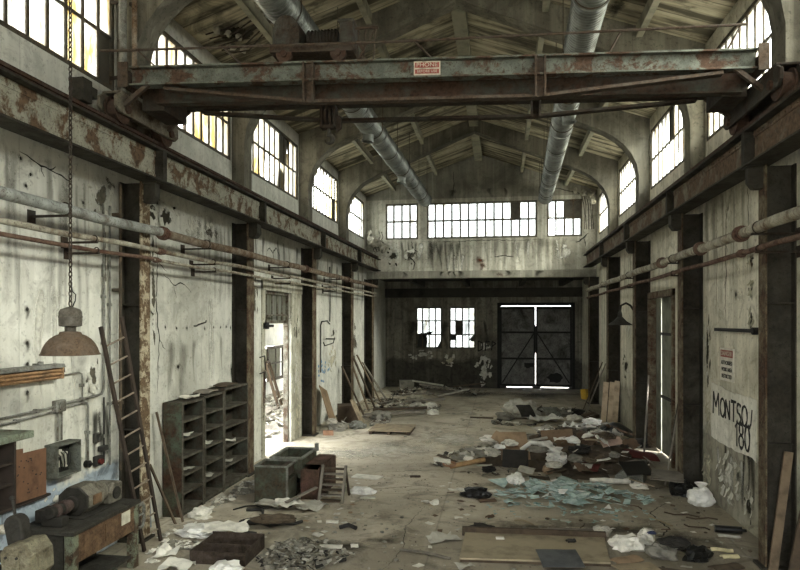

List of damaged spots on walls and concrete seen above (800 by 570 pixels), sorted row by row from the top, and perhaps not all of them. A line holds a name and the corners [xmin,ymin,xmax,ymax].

crack [21,152,71,182]
damp [396,242,464,276]
crack [156,254,191,360]